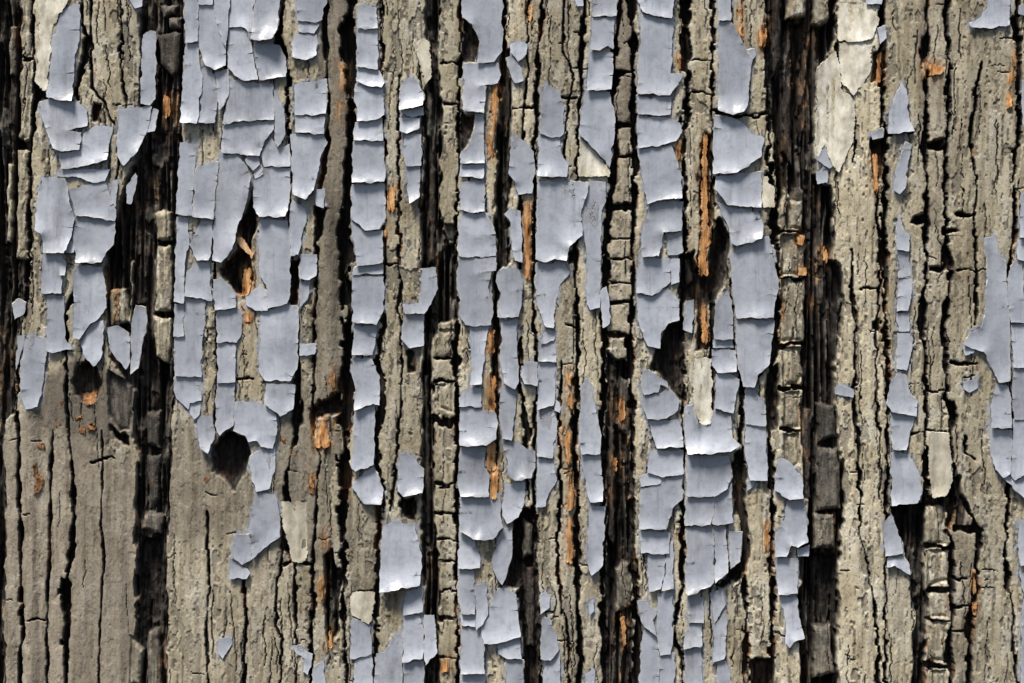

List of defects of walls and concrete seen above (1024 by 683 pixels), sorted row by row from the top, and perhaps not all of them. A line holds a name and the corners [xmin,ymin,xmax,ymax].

crack [16,0,116,683]
peeling [15,0,159,409]
peeling [173,0,328,579]
peeling [349,5,387,505]
peeling [350,521,437,683]
peeling [399,38,432,203]
peeling [401,267,438,348]
peeling [456,0,619,683]
crack [513,0,643,683]
peeling [636,0,810,683]
peeling [883,214,953,575]
peeling [963,195,1024,498]